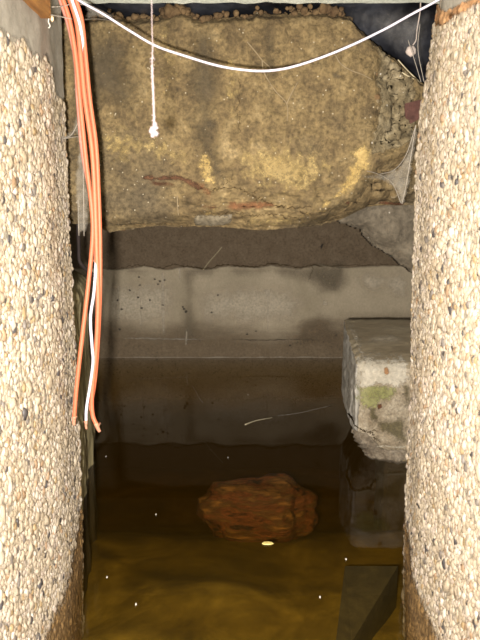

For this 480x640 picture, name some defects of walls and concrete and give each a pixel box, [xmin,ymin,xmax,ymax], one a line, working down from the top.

spalling [371,46,421,153]
rust [143,175,209,194]
leakage [69,223,94,269]
leakage [102,220,401,286]
leakage [353,334,409,401]
leakage [380,419,405,441]